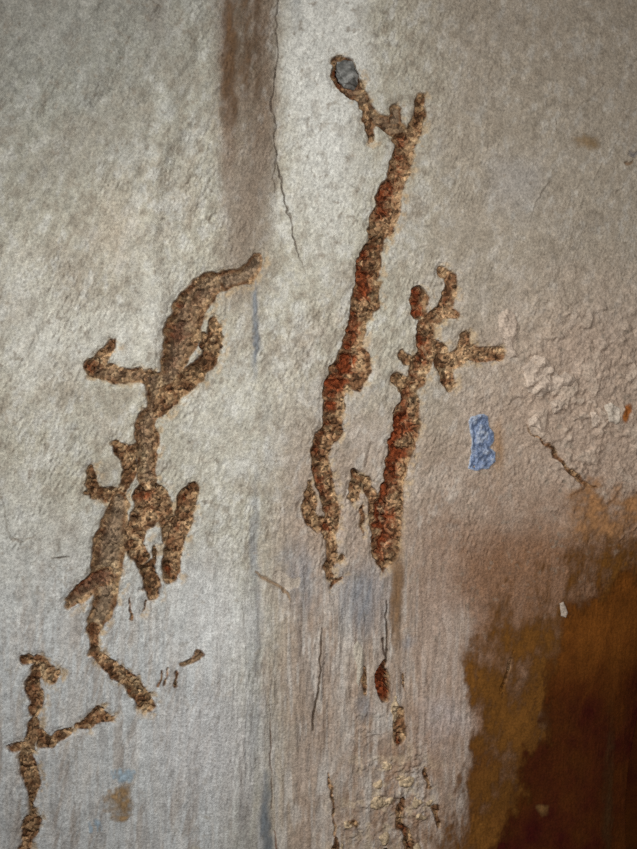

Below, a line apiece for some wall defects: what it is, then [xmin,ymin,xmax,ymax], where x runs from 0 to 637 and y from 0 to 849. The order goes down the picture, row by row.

crack [269,0,305,274]
spalling [127,596,136,624]
spalling [354,641,407,704]
leakage [440,535,637,849]
spalling [421,766,434,792]
hole [394,796,417,849]
spalling [429,803,443,830]